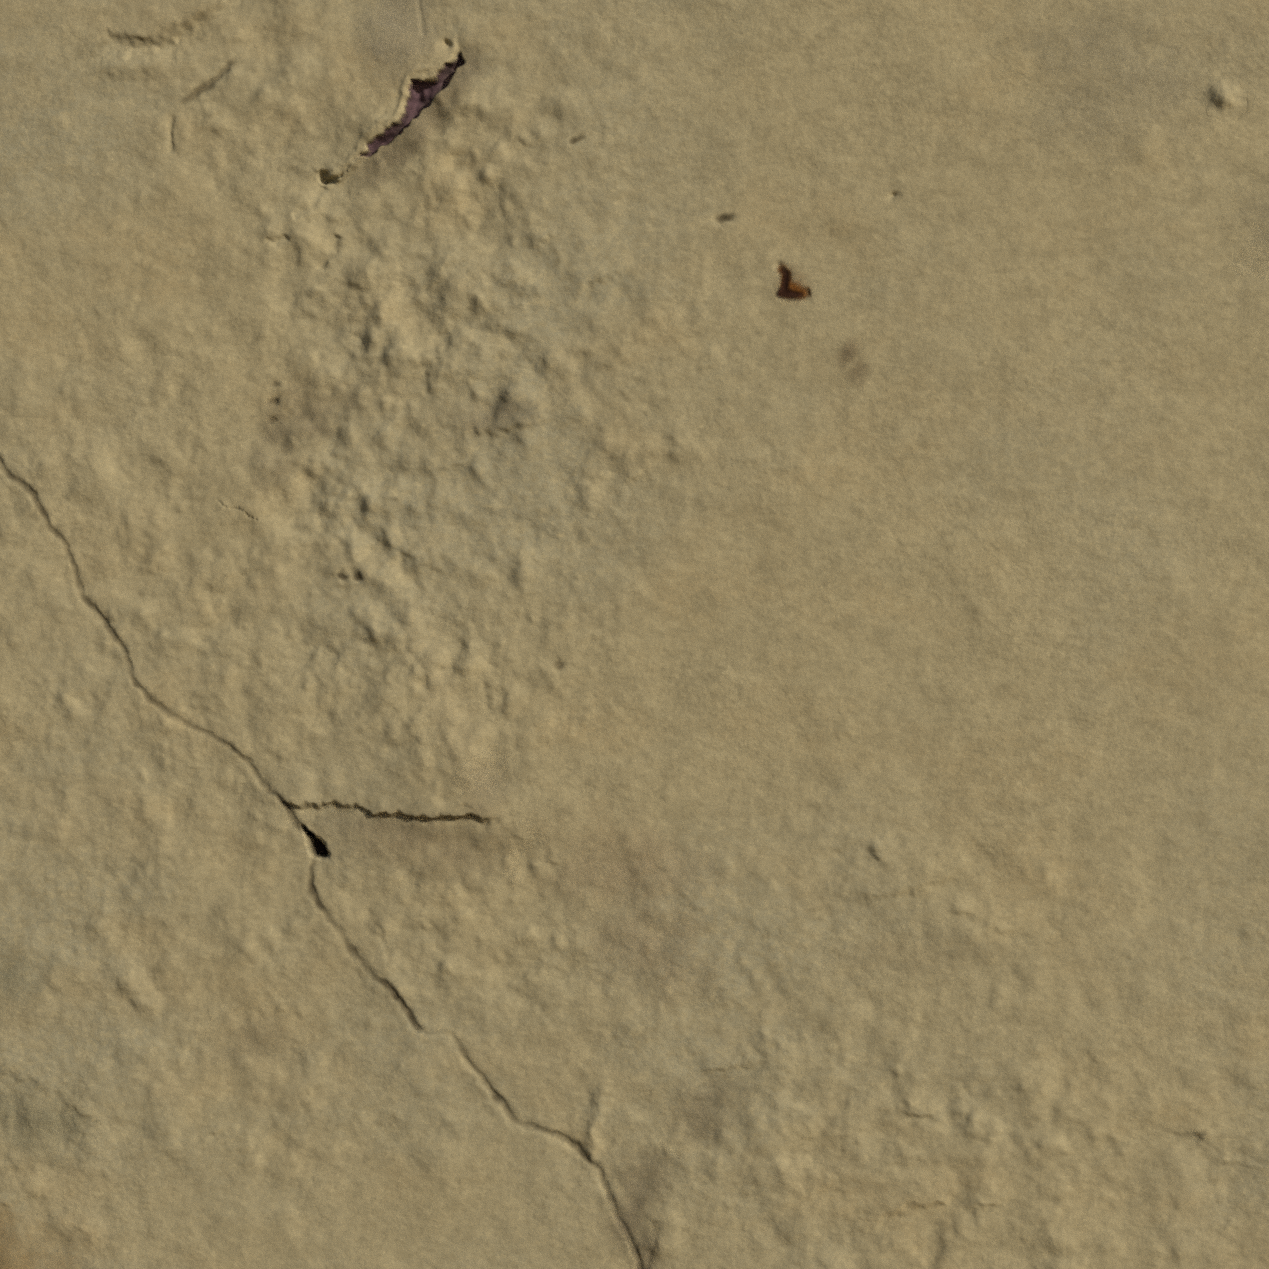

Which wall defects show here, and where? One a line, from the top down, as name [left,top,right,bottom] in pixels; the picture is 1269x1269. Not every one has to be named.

rust [777,266,810,299]
flaking render [220,0,677,732]
flaking render [265,718,533,900]
crack [310,883,322,908]
crack [380,980,419,1028]